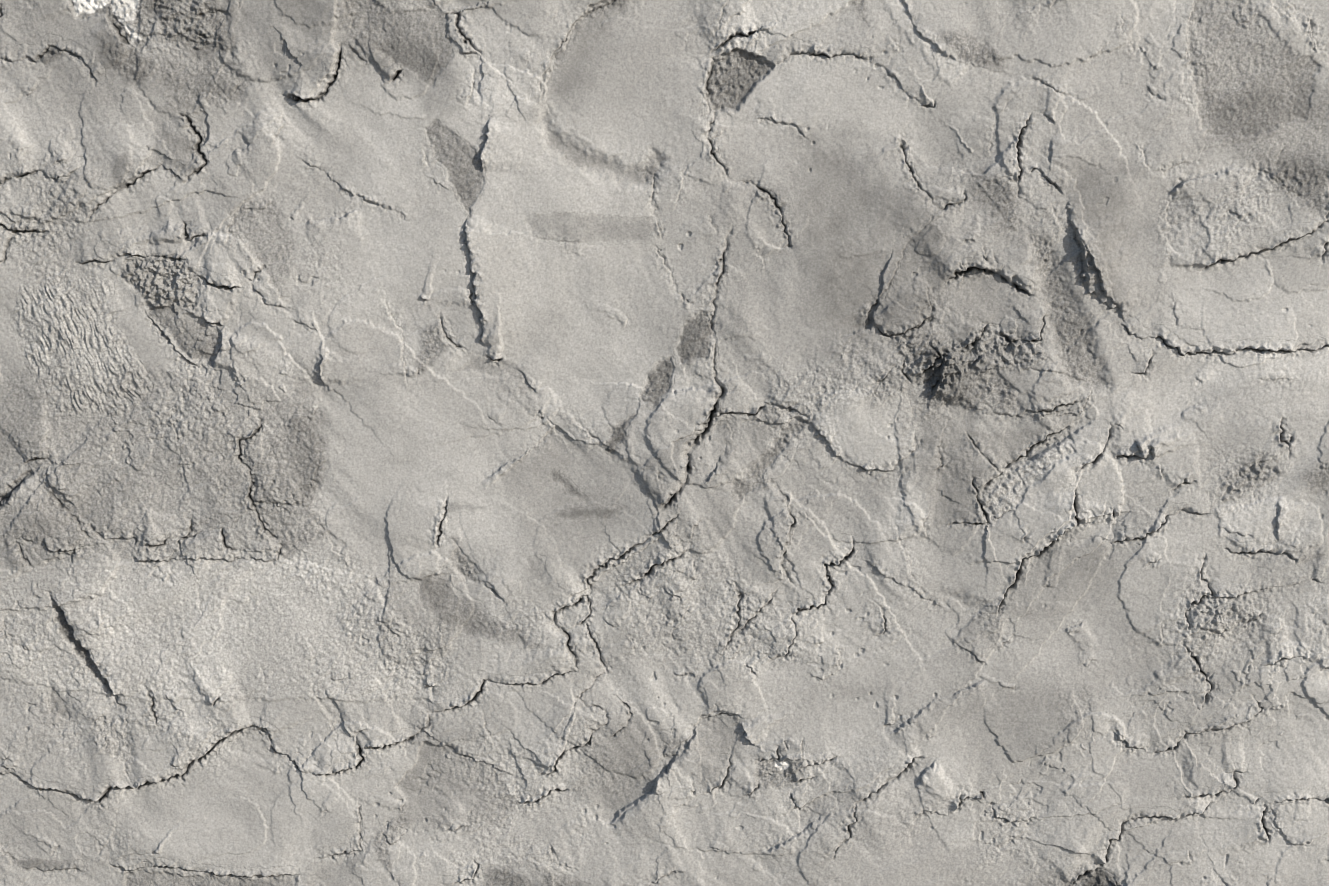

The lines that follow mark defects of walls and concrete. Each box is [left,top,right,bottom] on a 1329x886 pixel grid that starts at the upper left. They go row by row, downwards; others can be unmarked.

peeling [0,34,107,87]
spalling [66,0,235,55]
crack [444,9,483,58]
crack [710,0,763,55]
crack [706,111,792,250]
crack [898,137,970,212]
crack [1016,112,1063,198]
crack [0,224,53,266]
crack [436,217,506,366]
crack [551,171,809,673]
crack [236,416,303,562]
crack [830,756,924,862]